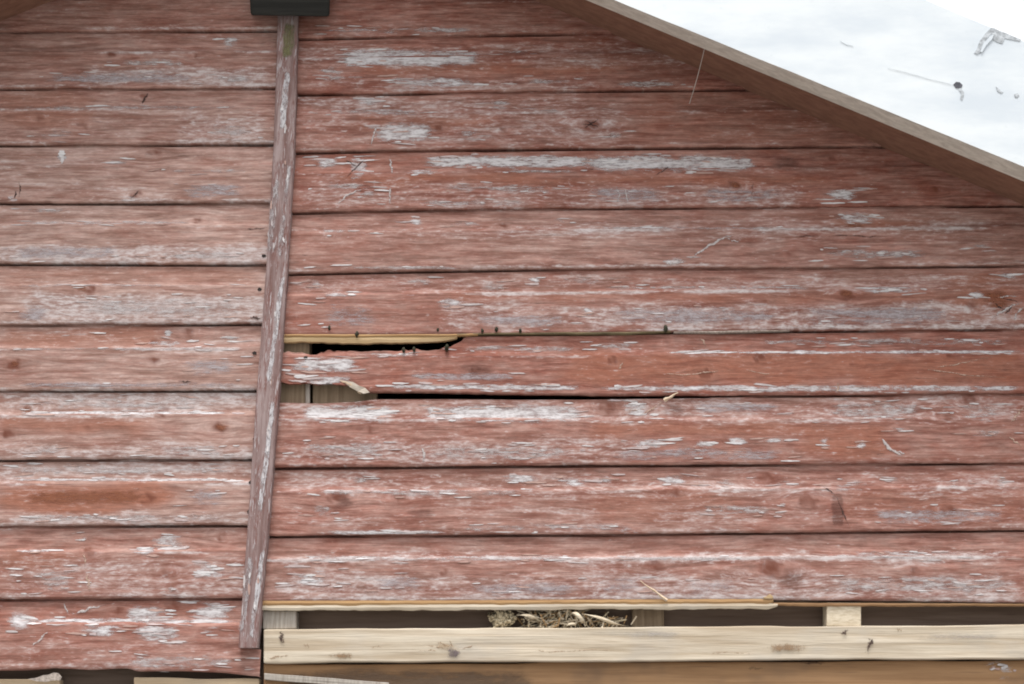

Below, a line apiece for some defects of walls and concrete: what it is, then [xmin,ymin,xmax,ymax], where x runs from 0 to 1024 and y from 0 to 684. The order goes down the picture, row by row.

peeling [301,48,501,89]
peeling [280,73,290,133]
peeling [411,153,752,204]
peeling [267,277,417,384]
peeling [306,403,399,423]
peeling [419,402,588,423]
peeling [608,383,1024,432]
peeling [258,403,274,510]
peeling [621,437,801,462]
peeling [275,554,588,591]
peeling [7,552,264,643]
peeling [111,651,259,671]